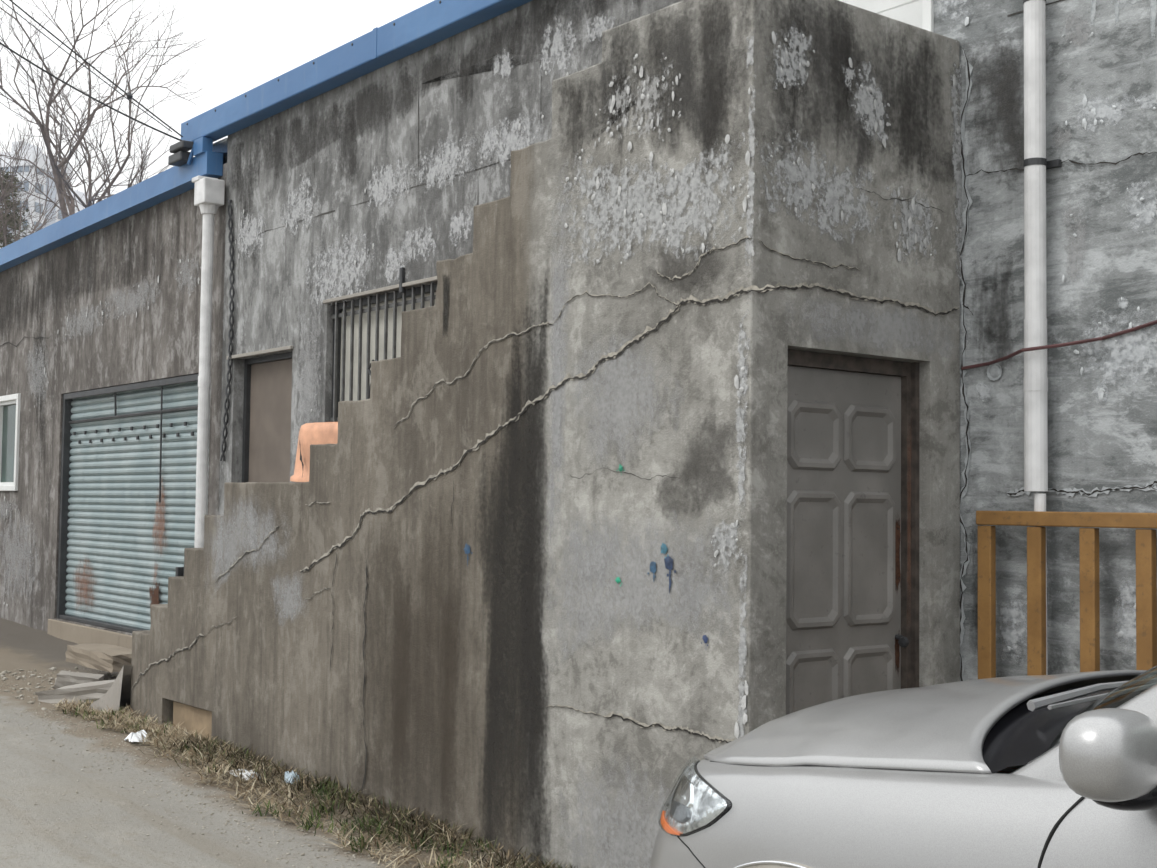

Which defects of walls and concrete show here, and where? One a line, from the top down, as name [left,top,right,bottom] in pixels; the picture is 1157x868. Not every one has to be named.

leakage [232,0,604,227]
leakage [559,12,738,167]
leakage [776,0,953,174]
crack [1061,152,1157,165]
leakage [660,248,717,290]
crack [300,49,1024,681]
rust [149,566,160,605]
leakage [480,264,566,865]
leakage [663,424,728,510]
crack [1006,480,1157,497]
crack [361,566,369,794]
crack [546,705,734,743]